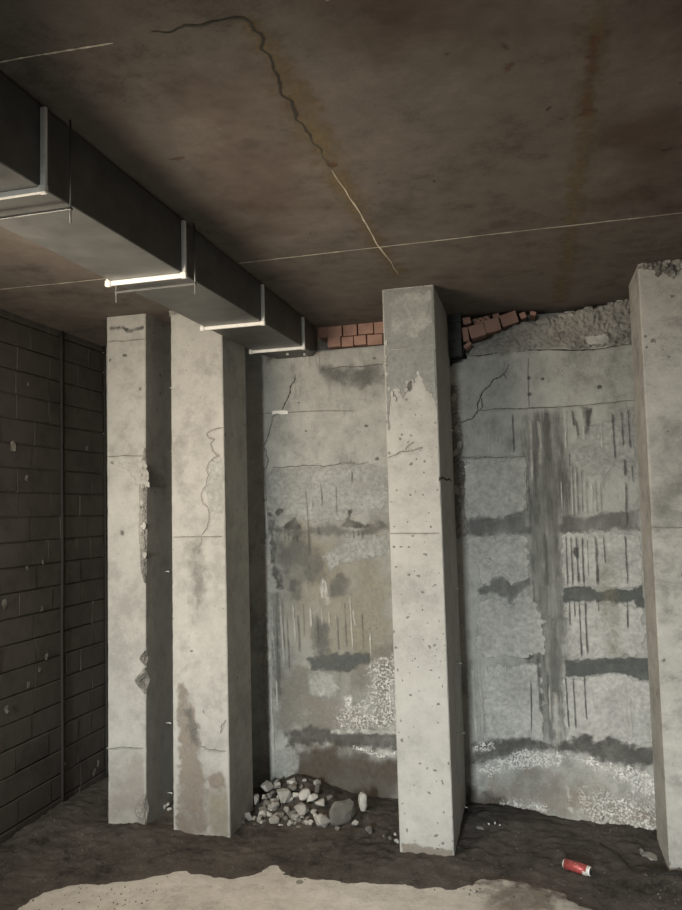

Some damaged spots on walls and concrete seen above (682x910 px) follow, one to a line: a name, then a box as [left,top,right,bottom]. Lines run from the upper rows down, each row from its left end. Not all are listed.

crack [154,16,398,274]
spalling [118,448,149,583]
crack [174,426,224,554]
crack [260,375,365,473]
crack [319,362,383,371]
crack [439,343,634,513]
spalling [135,650,150,694]
water stain [462,409,656,830]